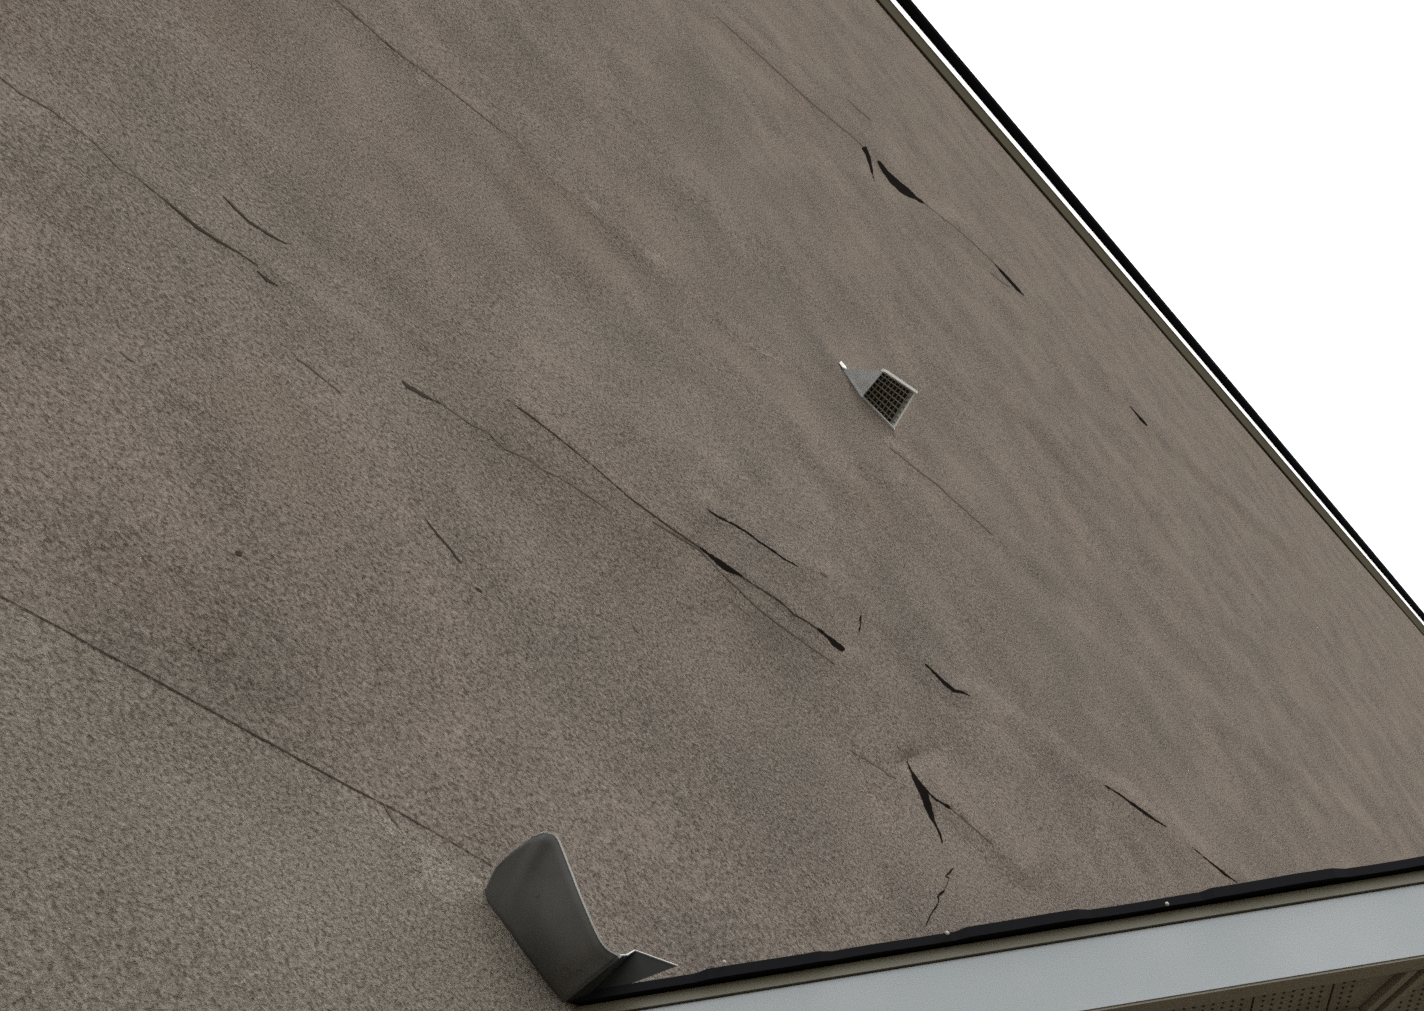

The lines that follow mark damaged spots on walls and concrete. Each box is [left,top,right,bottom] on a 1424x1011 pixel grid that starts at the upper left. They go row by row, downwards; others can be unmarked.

crack [0,76,287,286]
crack [717,17,1024,296]
crack [402,380,862,664]
crack [0,595,492,866]
crack [851,750,993,926]
crack [925,663,971,696]
crack [1105,785,1237,882]